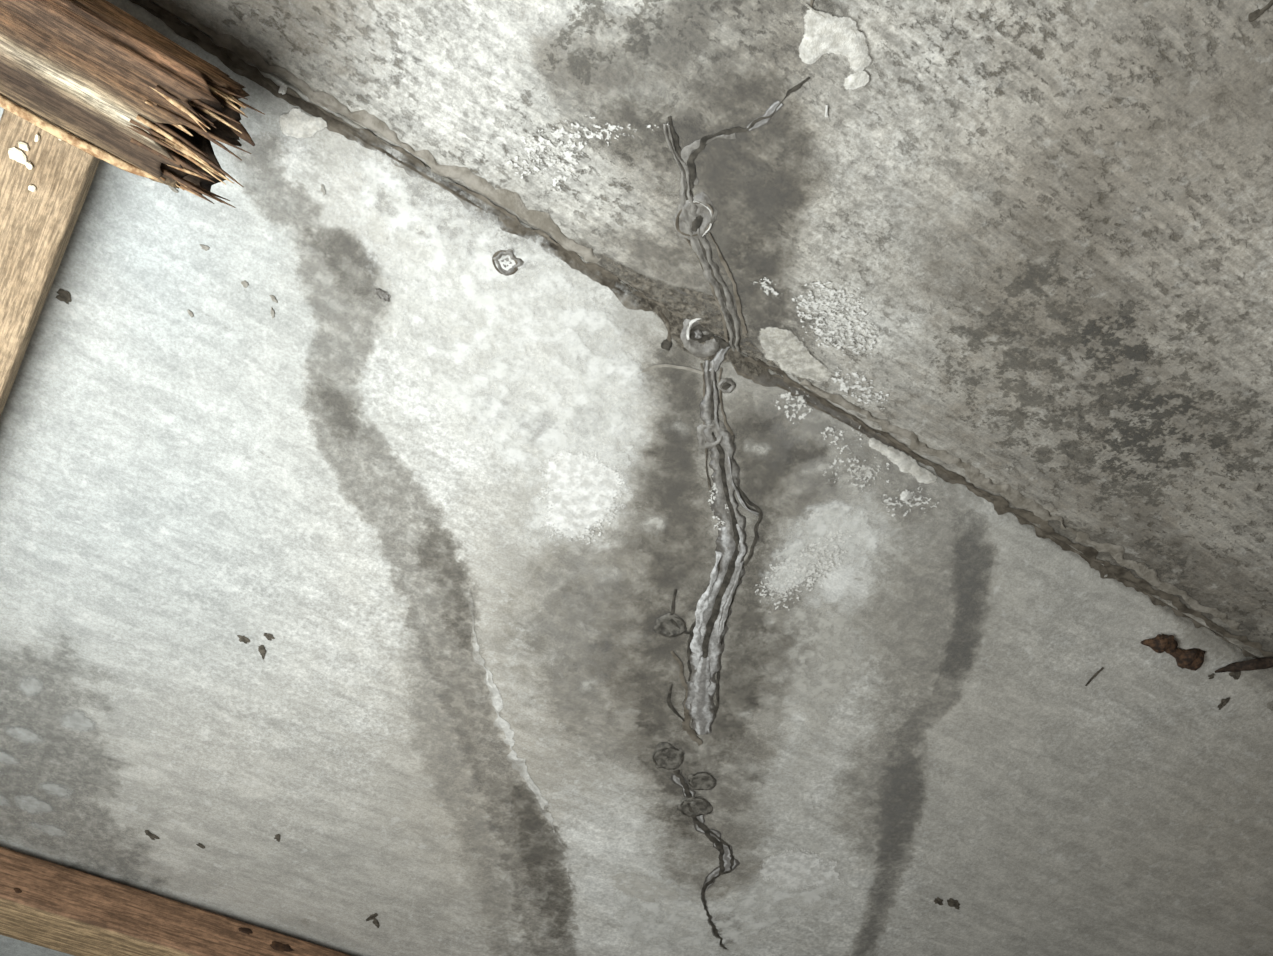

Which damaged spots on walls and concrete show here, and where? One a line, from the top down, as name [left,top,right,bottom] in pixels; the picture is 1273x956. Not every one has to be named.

peeling [799,4,871,90]
damp [506,115,668,194]
damp [343,149,642,544]
damp [775,390,813,424]
damp [754,277,890,409]
damp [708,476,728,530]
crack [652,77,810,950]
damp [755,416,939,731]
damp [466,588,576,892]